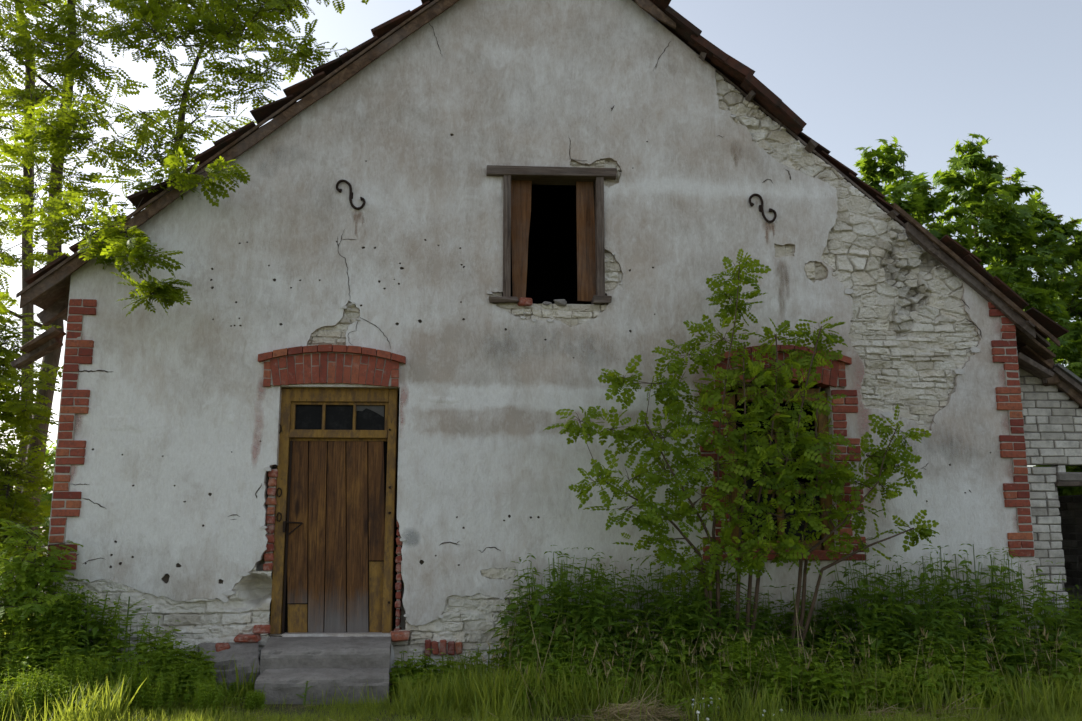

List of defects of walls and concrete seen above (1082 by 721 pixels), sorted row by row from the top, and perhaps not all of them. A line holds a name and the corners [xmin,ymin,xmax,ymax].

spalling [570,160,633,188]
spalling [308,302,362,346]
crack [337,229,391,349]
spalling [487,250,631,327]
spalling [715,72,980,435]
spalling [46,540,282,675]
spalling [393,567,553,679]